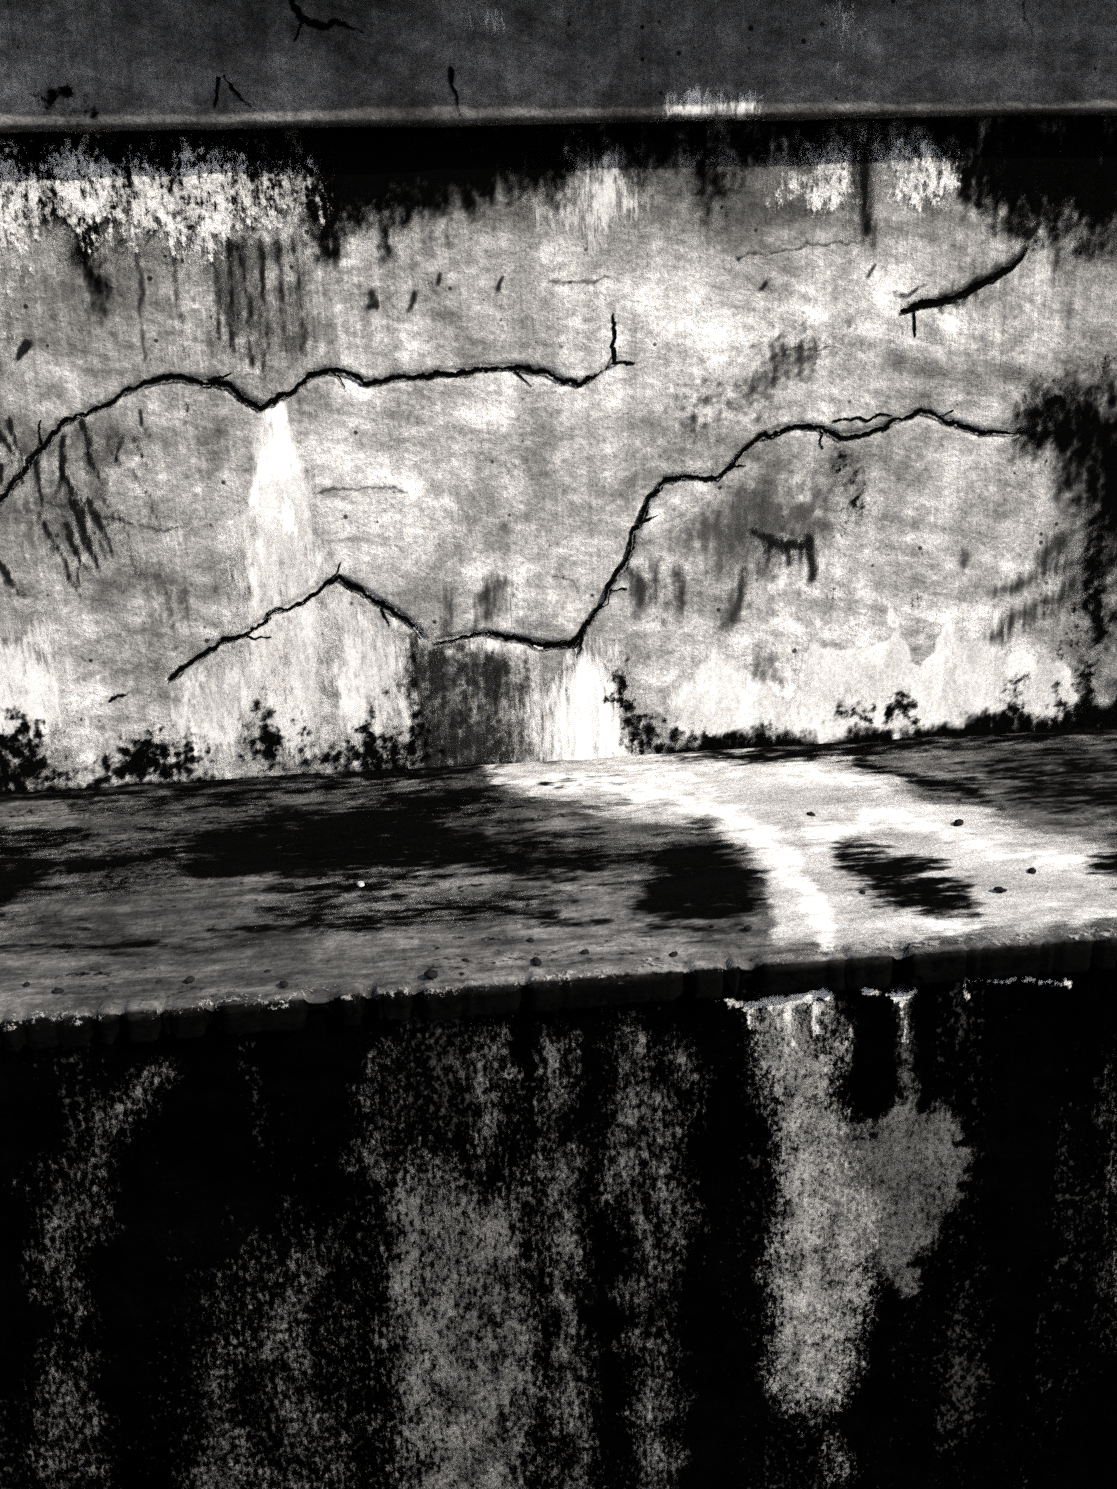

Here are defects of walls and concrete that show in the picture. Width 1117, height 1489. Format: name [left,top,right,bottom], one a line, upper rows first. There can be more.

leakage [0,82,1117,371]
crack [0,275,636,532]
crack [108,691,129,703]
leakage [0,362,1117,956]
crack [169,407,1026,681]
leakage [963,976,1072,999]
efflorescence [30,1362,105,1489]
leakage [27,1066,173,1315]
efflorescence [193,1249,354,1489]
efflorescence [354,1030,599,1489]
efflorescence [601,1030,699,1488]
efflorescence [724,987,972,1425]